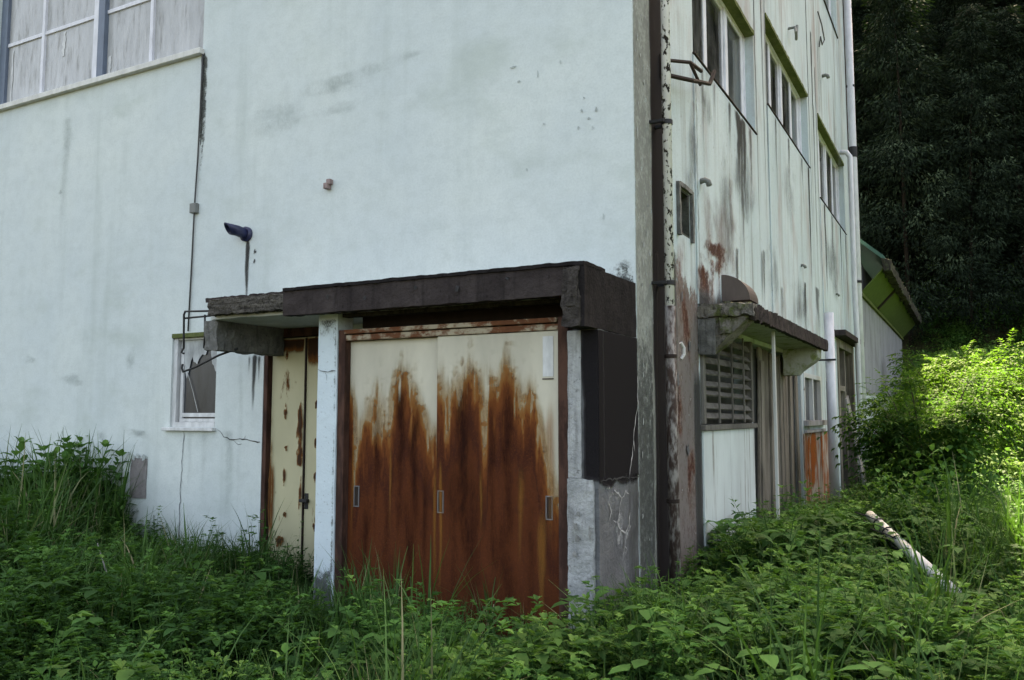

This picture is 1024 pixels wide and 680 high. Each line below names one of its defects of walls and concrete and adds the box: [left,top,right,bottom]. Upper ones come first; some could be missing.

leakage [753,0,767,111]
leakage [729,103,790,227]
leakage [806,23,847,269]
leakage [245,242,256,295]
corrosion [698,242,725,299]
corrosion [284,338,319,365]
corrosion [268,403,316,548]
corrosion [346,359,559,640]
crack [601,342,640,554]
corrosion [807,433,823,494]